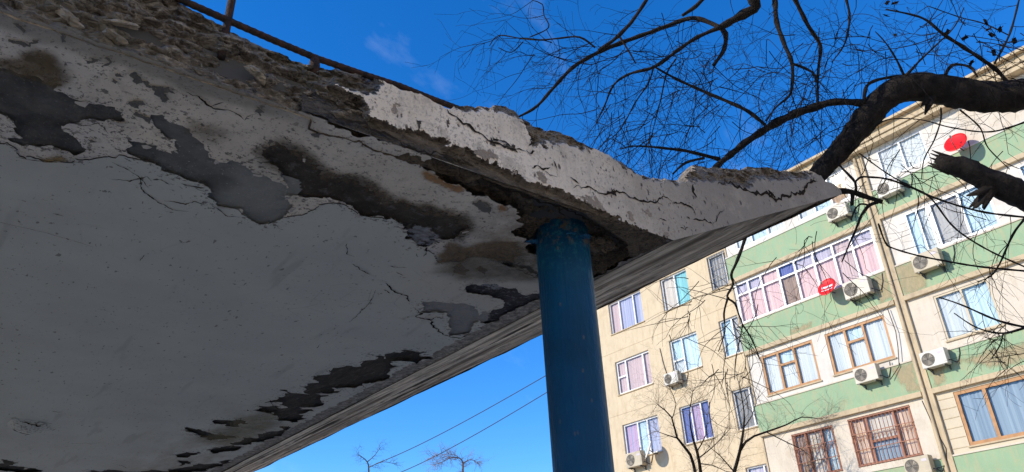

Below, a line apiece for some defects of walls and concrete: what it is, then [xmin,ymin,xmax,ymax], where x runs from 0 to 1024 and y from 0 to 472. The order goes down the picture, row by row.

crack [112,162,237,217]
spalling [0,0,670,278]
damp [258,142,531,280]
crack [330,109,818,256]
peeling [421,266,540,336]
peeling [141,349,432,472]